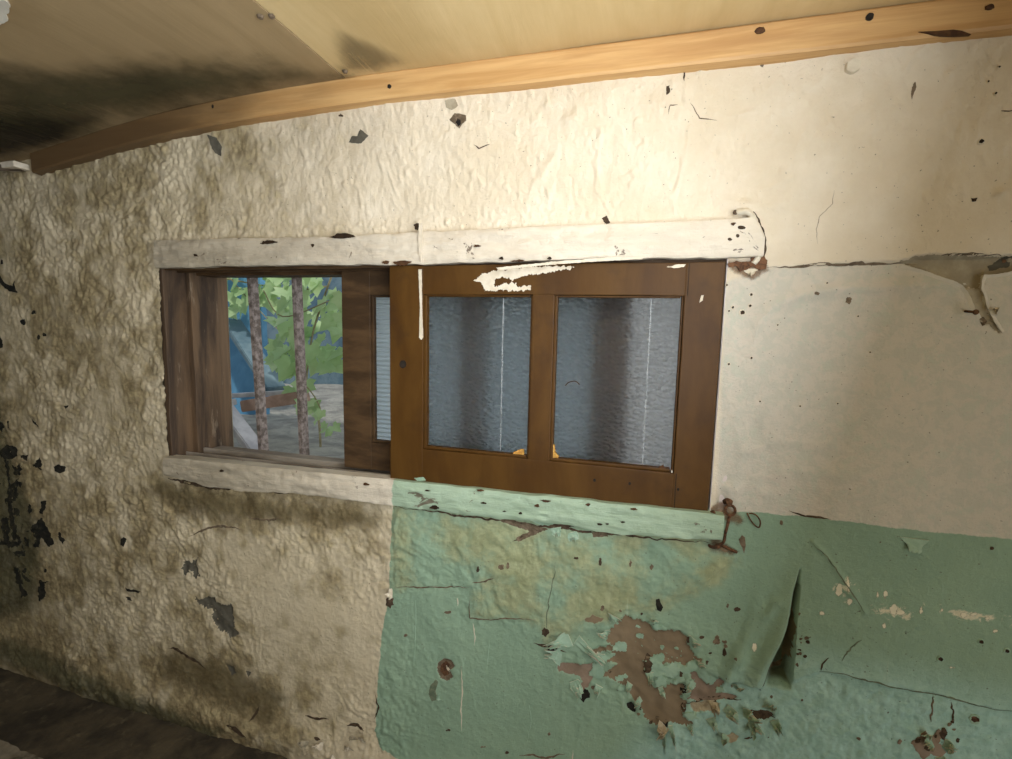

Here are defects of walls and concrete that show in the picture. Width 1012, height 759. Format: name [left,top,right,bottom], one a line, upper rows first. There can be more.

peeling [0,0,10,25]
leakage [0,69,271,155]
leakage [0,276,17,293]
peeling [473,257,643,292]
flaking render [900,254,1012,333]
leakage [0,417,65,612]
leakage [158,485,372,524]
corrosion [711,503,742,523]
flaking render [195,596,239,638]
peeling [877,591,905,628]
flaking render [557,605,783,754]
flaking render [897,720,960,759]